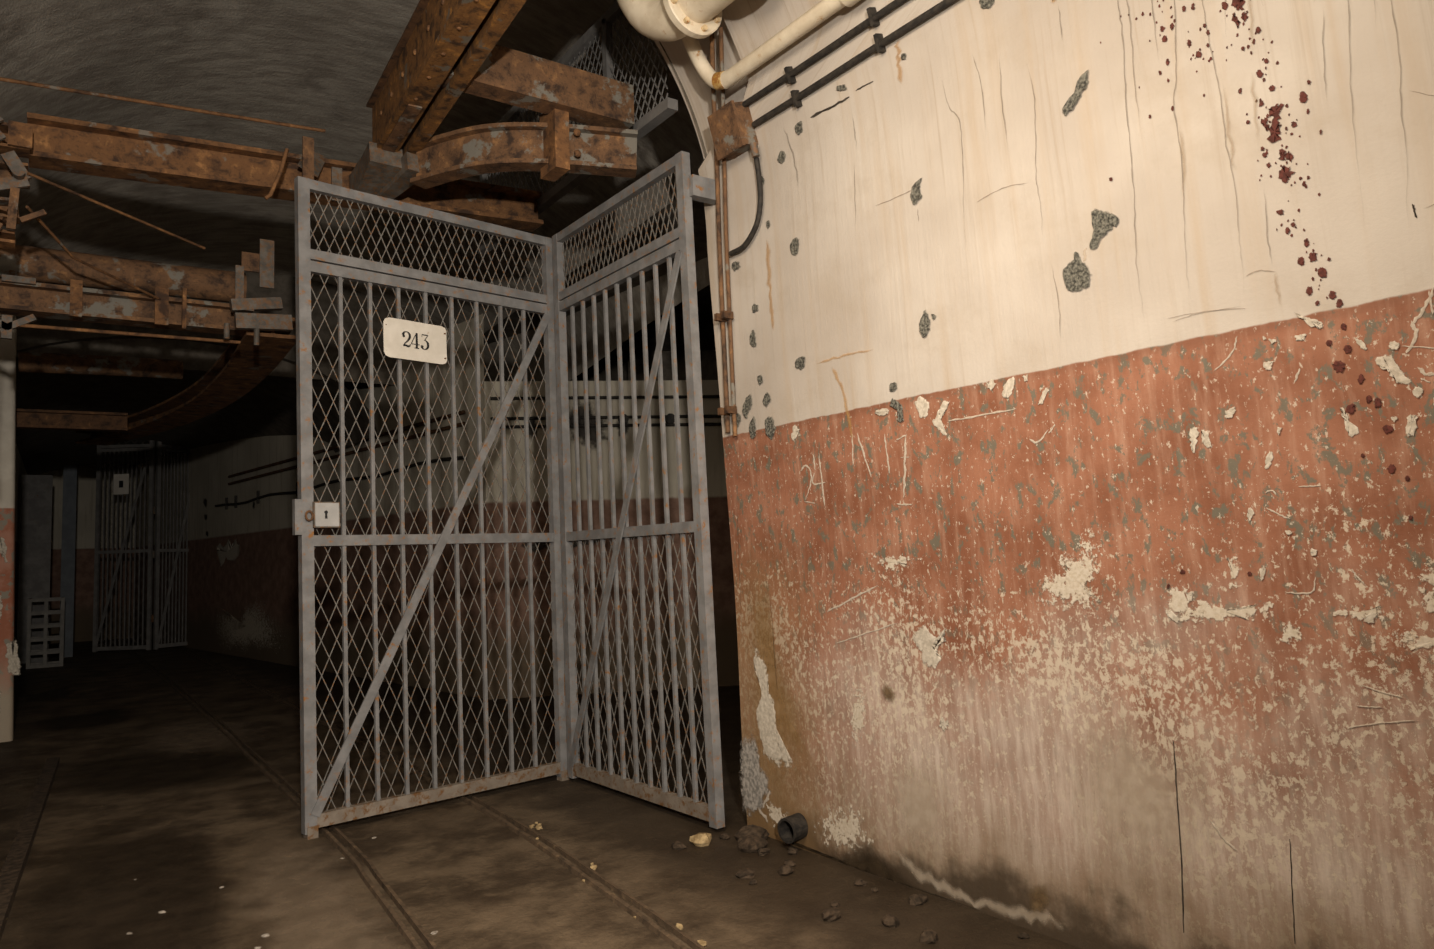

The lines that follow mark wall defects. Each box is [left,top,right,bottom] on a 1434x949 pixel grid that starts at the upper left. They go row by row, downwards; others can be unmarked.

spalling [1062,70,1089,116]
spalling [1063,209,1119,291]
peeling [1355,288,1434,405]
peeling [1189,427,1212,453]
peeling [1340,408,1359,437]
peeling [1166,591,1273,623]
peeling [5,641,20,675]
peeling [913,625,946,668]
peeling [753,648,792,767]
leakage [850,682,865,742]
leakage [766,799,785,827]
leakage [791,805,1051,922]